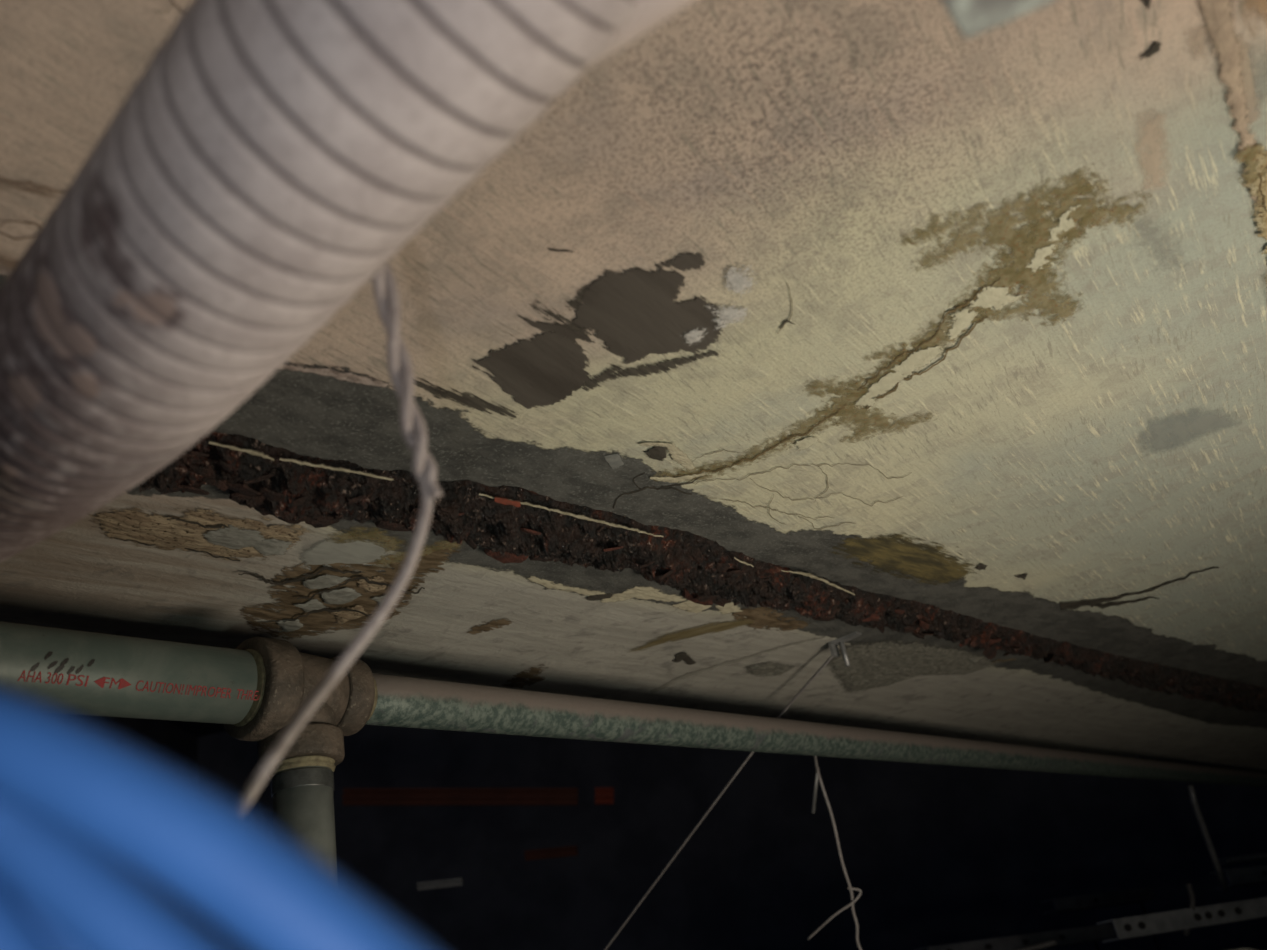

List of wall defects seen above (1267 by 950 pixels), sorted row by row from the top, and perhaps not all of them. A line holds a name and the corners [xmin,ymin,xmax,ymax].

crack [1199,0,1267,254]
efflorescence [684,265,757,346]
crack [777,283,796,334]
peeling [89,484,1267,729]
rust [139,431,1267,713]
peeling [212,253,1267,688]
crack [1060,567,1219,610]